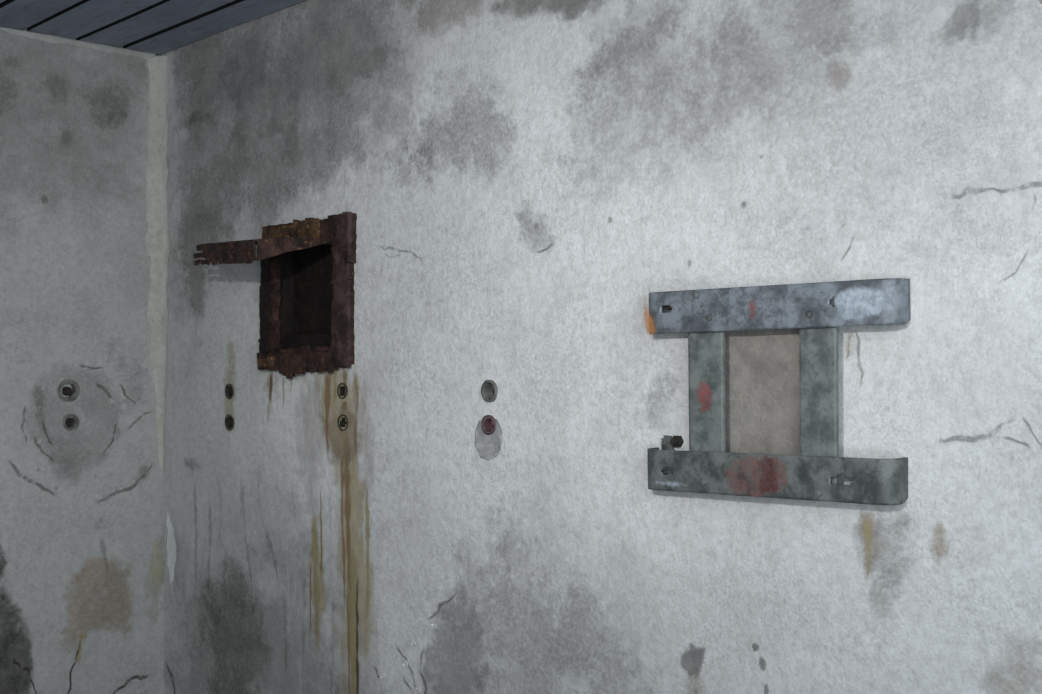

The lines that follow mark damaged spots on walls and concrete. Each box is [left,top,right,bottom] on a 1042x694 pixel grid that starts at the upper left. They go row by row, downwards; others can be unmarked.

rust [310,518,324,630]
rust [322,369,370,694]
damp [0,594,32,694]